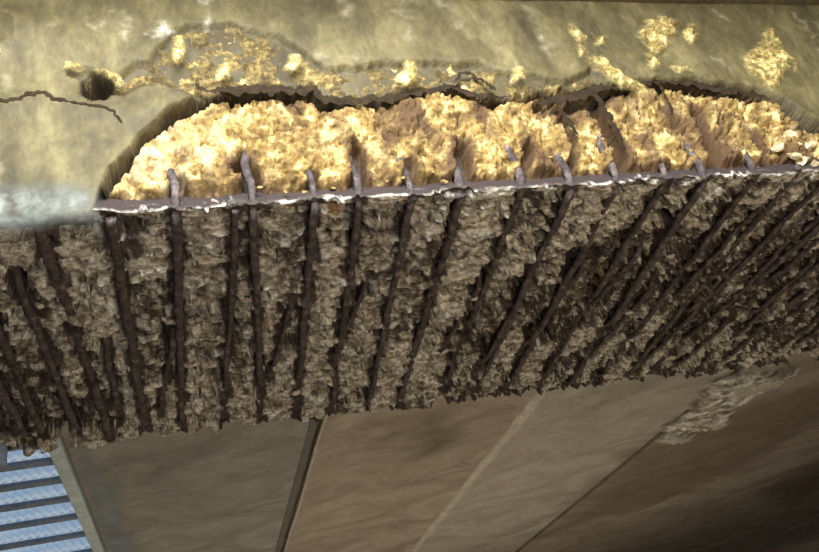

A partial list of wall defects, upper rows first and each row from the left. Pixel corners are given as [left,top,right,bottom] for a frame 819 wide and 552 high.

peeling [643,17,679,66]
crack [0,90,123,123]
corrosion [278,237,304,296]
spalling [0,25,819,457]
corrosion [407,237,442,317]
corrosion [468,219,819,356]
corrosion [132,278,177,379]
corrosion [205,318,247,374]